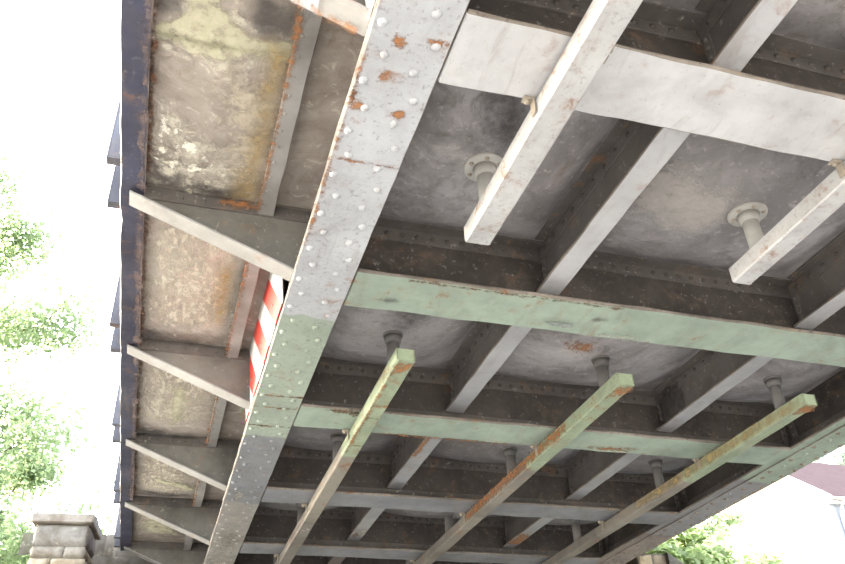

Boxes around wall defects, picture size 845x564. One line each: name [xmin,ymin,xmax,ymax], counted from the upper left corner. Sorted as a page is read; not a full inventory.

water stain [150,0,293,195]
rust [220,1,357,210]
rust [347,49,369,110]
rust [390,363,412,375]
rust [332,385,388,452]
rust [465,425,566,519]